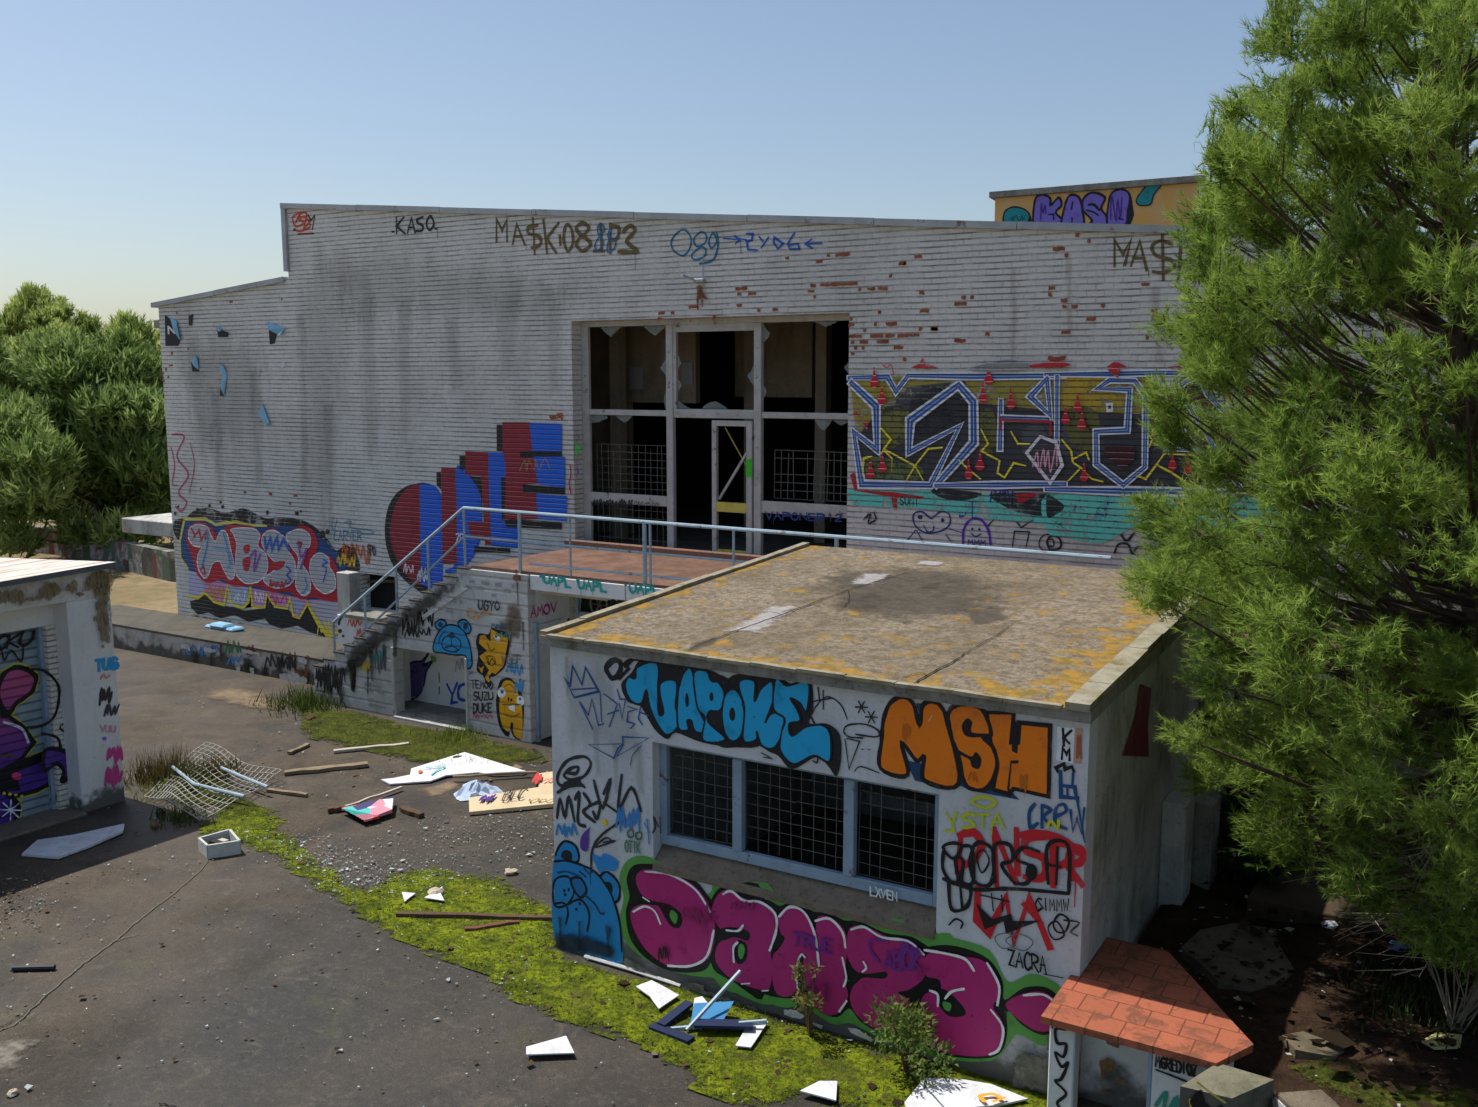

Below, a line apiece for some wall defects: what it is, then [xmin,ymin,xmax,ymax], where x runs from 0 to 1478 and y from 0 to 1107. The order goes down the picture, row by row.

peeling [807,254,922,298]
peeling [735,286,778,312]
peeling [1048,286,1105,321]
peeling [848,291,938,361]
water stain [854,574,886,584]
water stain [732,606,794,632]